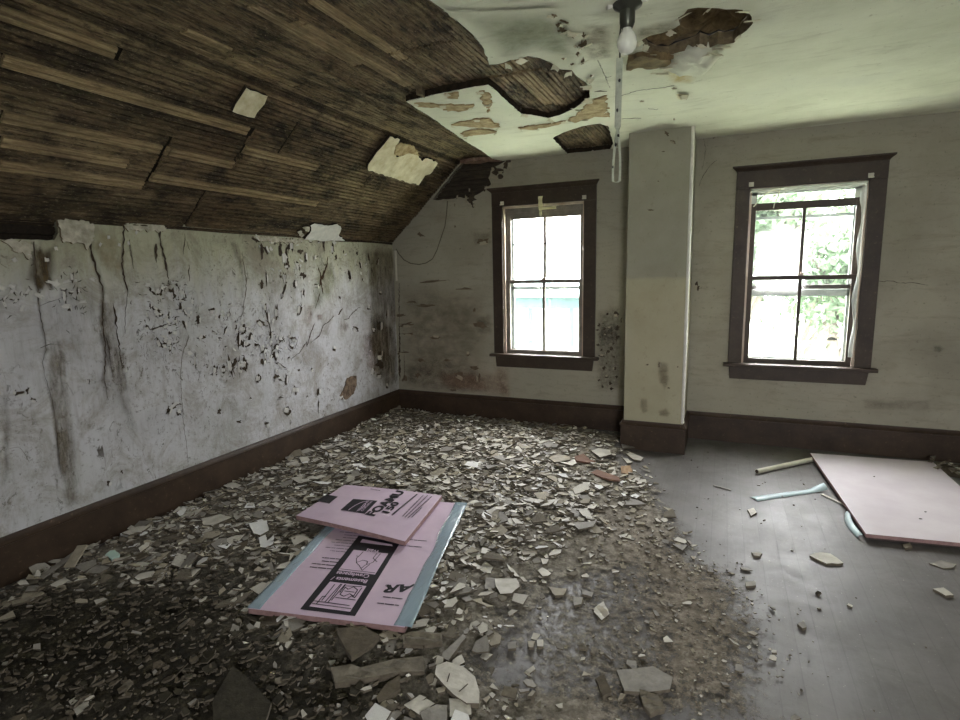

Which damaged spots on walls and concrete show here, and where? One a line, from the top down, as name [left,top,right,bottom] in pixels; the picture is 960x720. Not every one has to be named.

spalling [407,14,613,208]
spalling [626,8,761,71]
water stain [33,250,51,288]
crack [33,242,61,470]
peeling [0,266,96,319]
spalling [0,218,166,266]
water stain [62,225,134,398]
peeling [130,234,379,416]